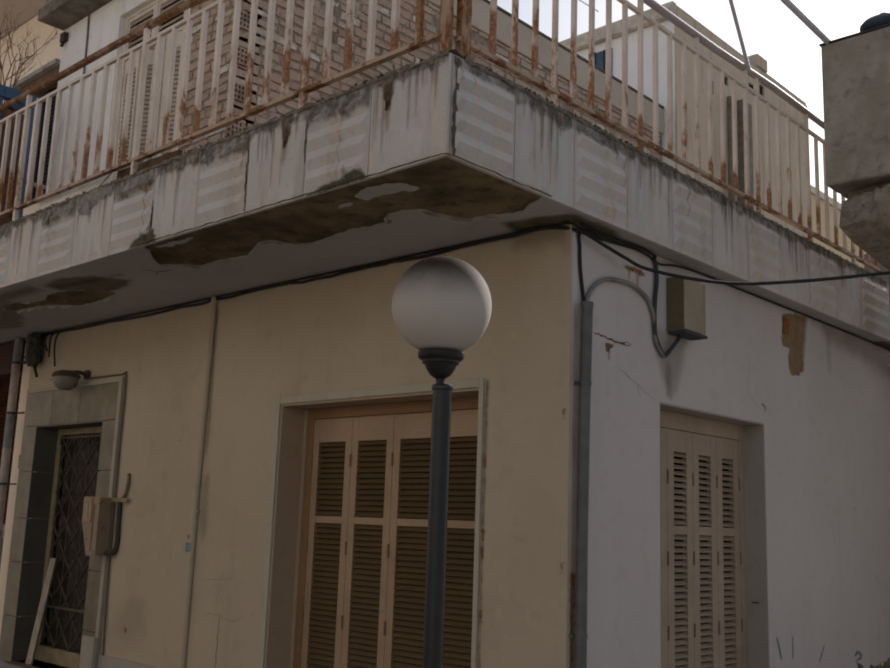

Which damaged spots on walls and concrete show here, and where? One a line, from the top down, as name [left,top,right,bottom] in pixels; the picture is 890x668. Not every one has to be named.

damp [104,78,384,199]
damp [394,54,888,287]
damp [0,199,76,238]
flaking render [135,153,552,270]
damp [130,229,156,249]
flaking render [1,289,115,313]
damp [47,277,127,290]
crack [594,333,632,347]
flaking render [780,313,810,376]
flaking render [855,658,890,668]